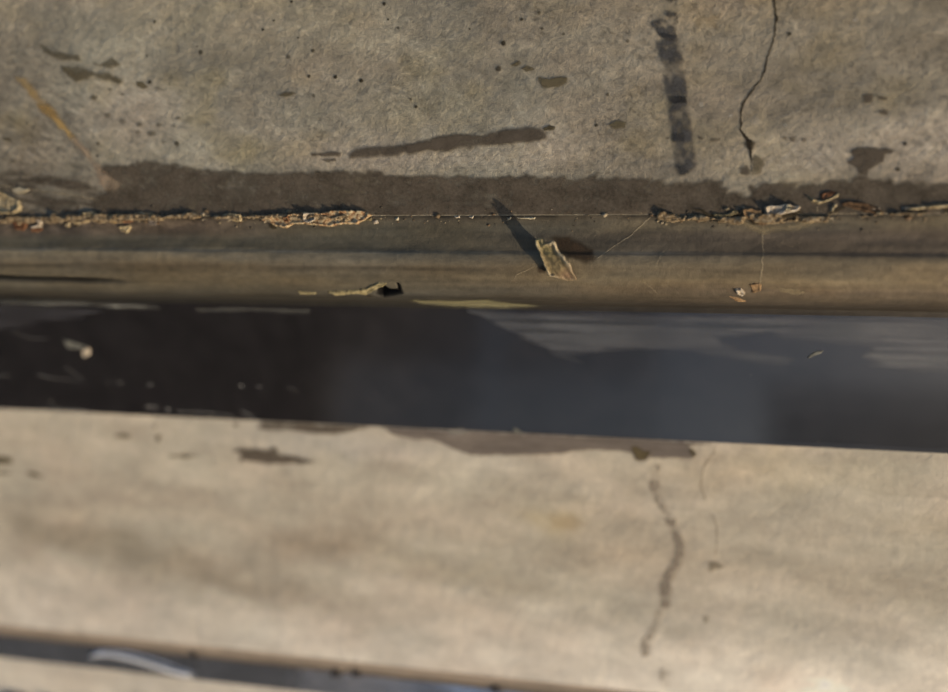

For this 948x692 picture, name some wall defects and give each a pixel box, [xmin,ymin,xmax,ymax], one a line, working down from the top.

crack [740,0,778,162]
peeling [0,187,379,233]
leakage [0,161,948,217]
peeling [656,191,948,234]
spalling [535,238,593,281]